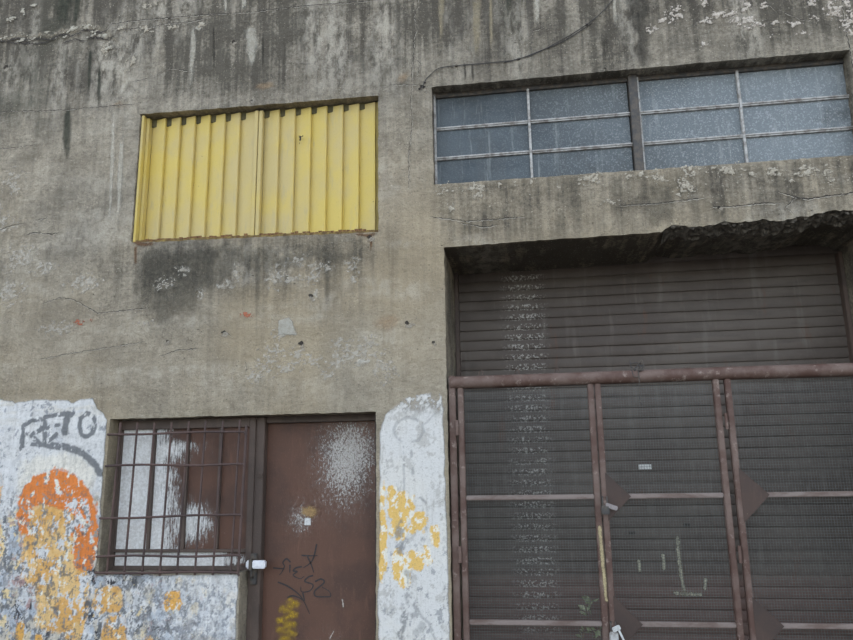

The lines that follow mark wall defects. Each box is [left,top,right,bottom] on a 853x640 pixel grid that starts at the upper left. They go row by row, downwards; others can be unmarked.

peeling [0,23,124,57]
leakage [190,26,201,74]
leakage [247,28,264,62]
leakage [630,0,647,64]
peeling [646,5,683,35]
peeling [699,0,853,38]
leakage [88,51,100,96]
peeling [621,160,757,197]
peeling [767,164,836,185]
crack [617,191,853,214]
crack [45,293,144,314]
peeling [0,422,237,640]